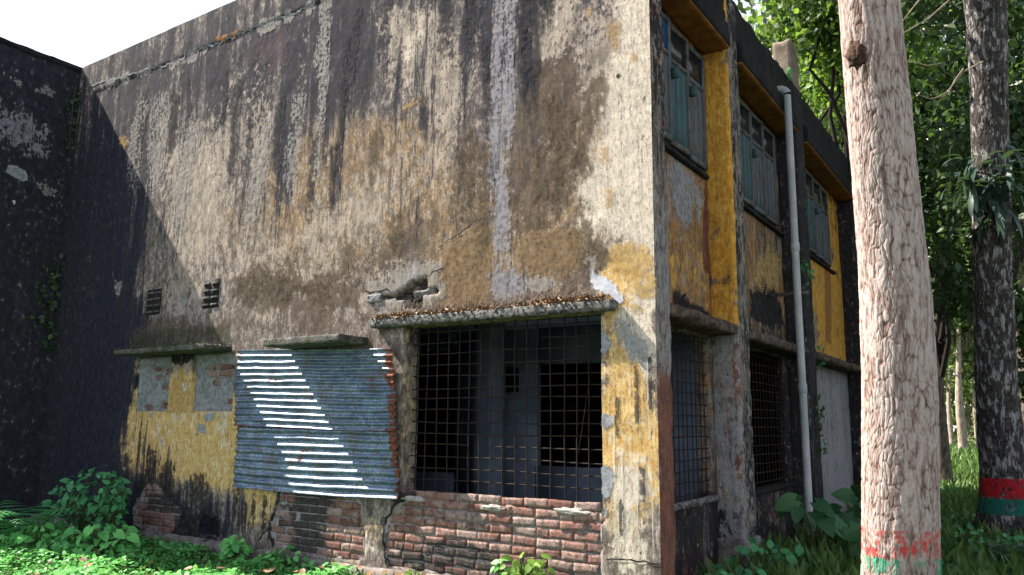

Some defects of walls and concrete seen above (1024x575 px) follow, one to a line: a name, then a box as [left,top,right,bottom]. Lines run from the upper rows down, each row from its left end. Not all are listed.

spalling [5,165,28,181]
water stain [167,76,193,158]
water stain [220,68,243,184]
water stain [438,0,608,305]
peeling [672,158,703,229]
water stain [232,241,365,314]
peeling [367,220,493,311]
water stain [576,211,623,304]
spalling [601,331,611,354]
peeling [145,362,215,434]
spalling [601,413,612,431]
water stain [136,446,212,538]